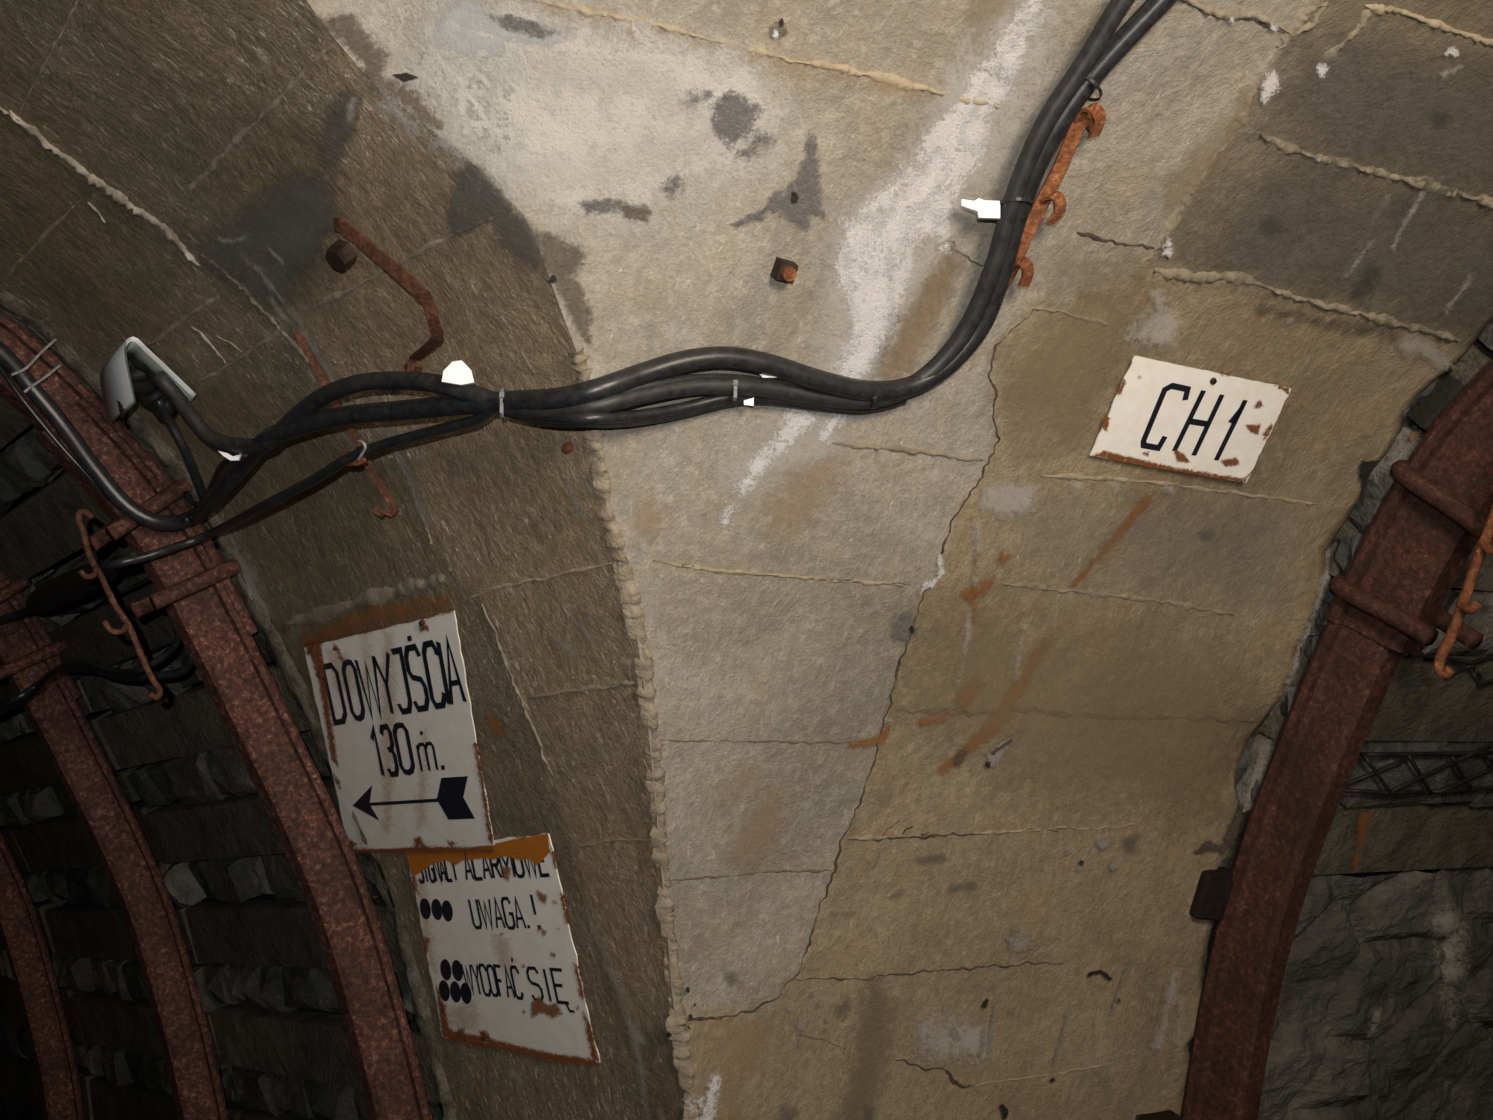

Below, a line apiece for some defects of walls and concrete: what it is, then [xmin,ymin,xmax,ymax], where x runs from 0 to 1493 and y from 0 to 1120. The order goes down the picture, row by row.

damp [376,0,801,239]
crack [658,310,1257,1021]
rust [938,637,1052,774]